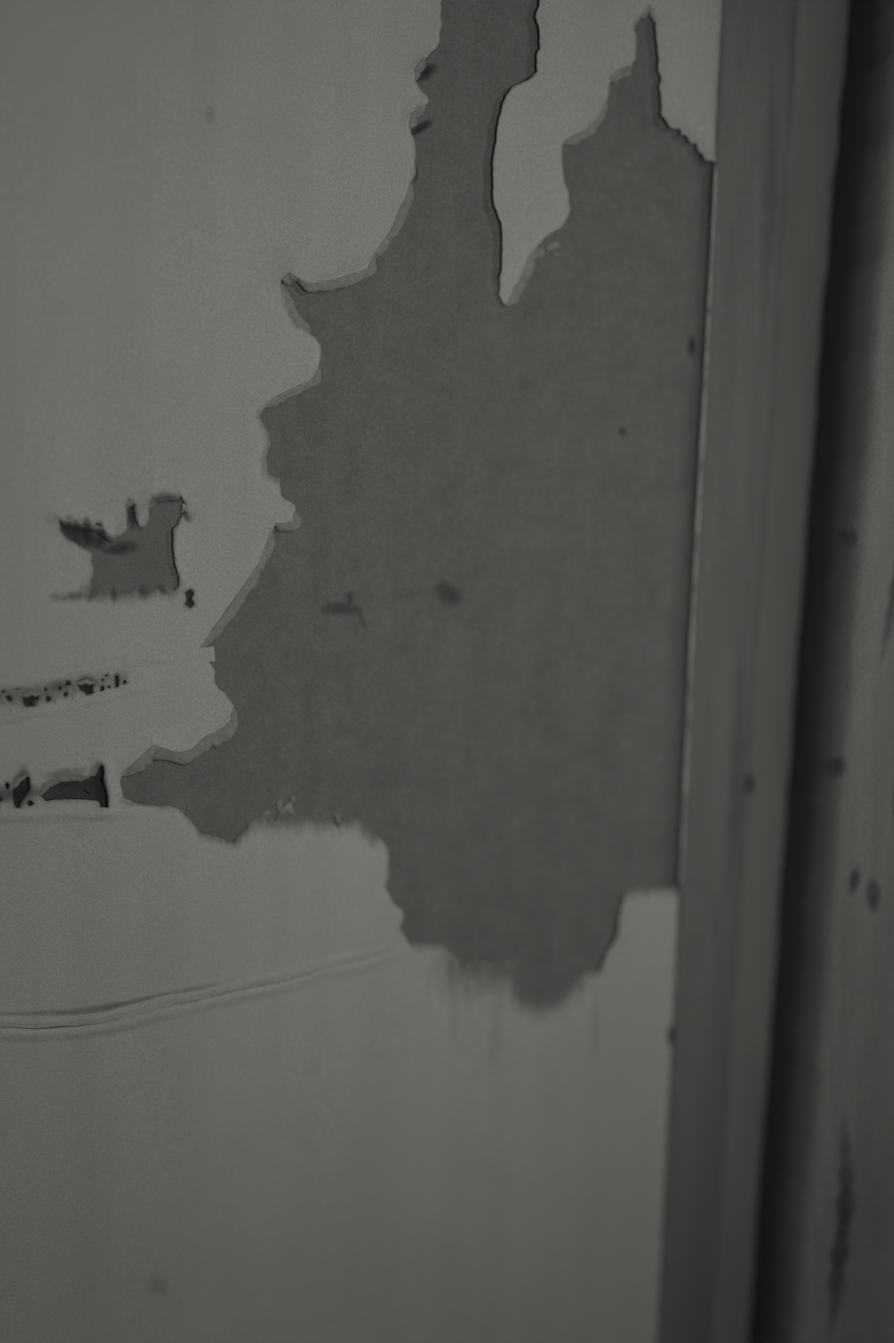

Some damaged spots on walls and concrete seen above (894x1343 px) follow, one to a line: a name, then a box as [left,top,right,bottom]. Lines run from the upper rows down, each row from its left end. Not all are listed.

peeling [58,494,194,608]
peeling [120,0,718,997]